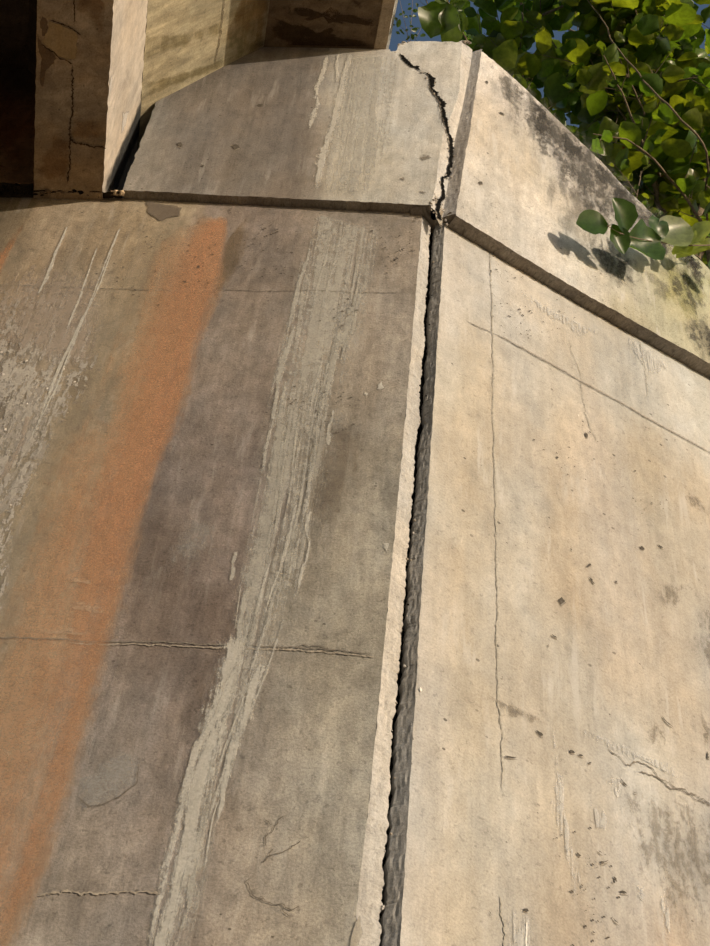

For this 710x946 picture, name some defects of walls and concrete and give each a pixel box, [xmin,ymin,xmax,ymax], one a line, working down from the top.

crack [51,0,81,35]
leakage [513,84,653,230]
leakage [599,248,633,283]
leakage [671,256,710,355]
peeling [0,227,120,610]
crack [0,44,455,945]
leakage [149,216,376,946]
crack [473,253,710,791]
crack [610,750,710,806]